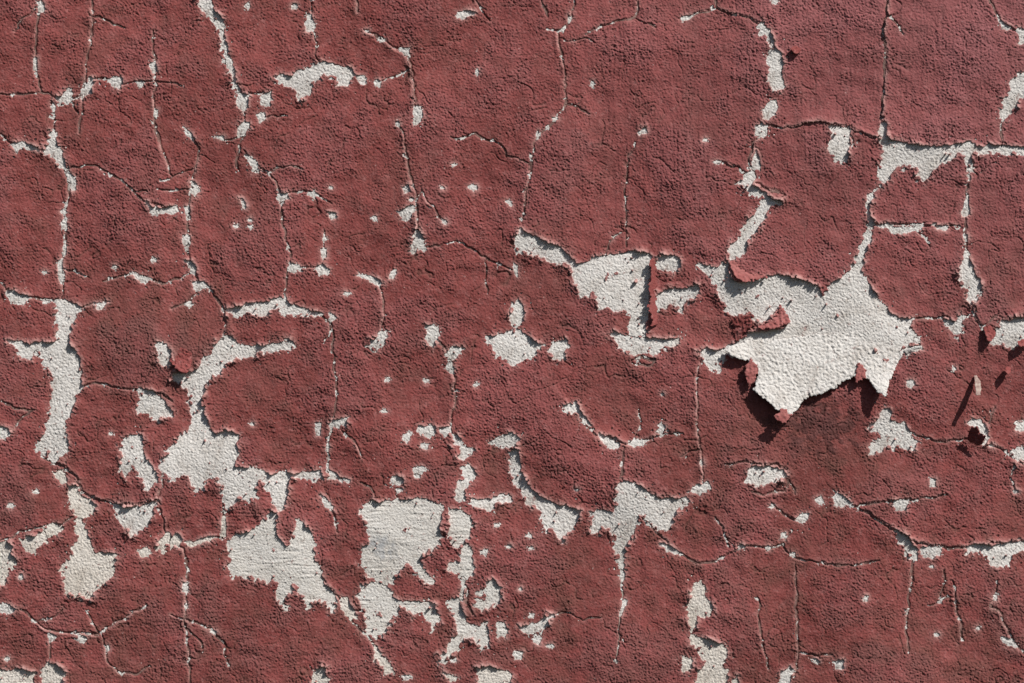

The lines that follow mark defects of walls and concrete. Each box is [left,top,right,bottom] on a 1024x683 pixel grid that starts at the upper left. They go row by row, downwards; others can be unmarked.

crack [0,455,230,683]
crack [0,0,511,360]
peeling [274,55,382,106]
crack [311,312,378,531]
peeling [0,292,722,683]
crack [416,321,465,425]
peeling [678,573,740,683]
peeling [510,113,1024,456]
peeling [753,0,802,144]
crack [580,364,1024,683]
crack [702,1,904,197]
peeling [961,535,1024,574]